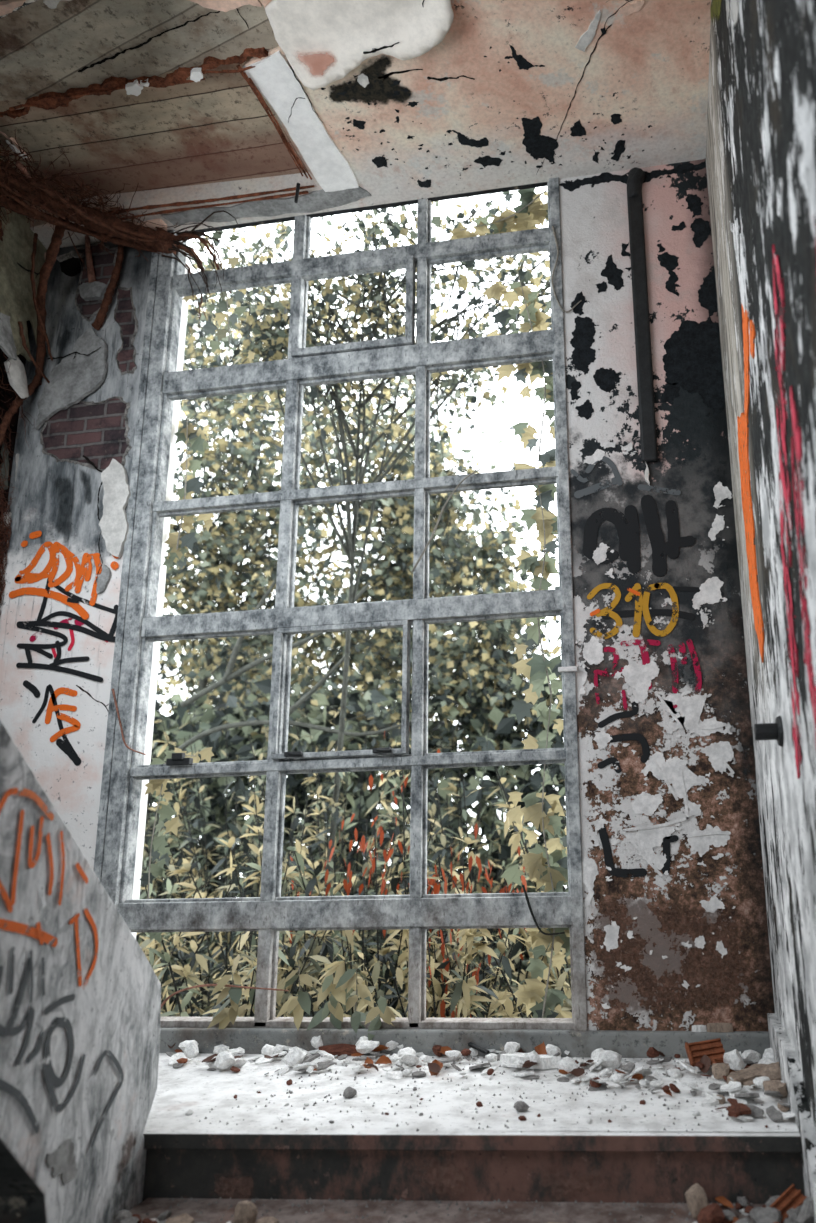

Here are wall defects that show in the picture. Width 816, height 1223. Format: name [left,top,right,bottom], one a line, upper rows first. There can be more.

flaking render [0,0,279,101]
crack [537,0,633,172]
flaking render [343,113,644,192]
peeling [657,243,680,296]
peeling [671,194,711,248]
peeling [570,243,632,420]
peeling [660,270,725,422]
flaking render [0,207,138,595]
peeling [592,543,615,579]
peeling [692,577,727,629]
peeling [708,481,733,541]
peeling [575,636,735,1009]